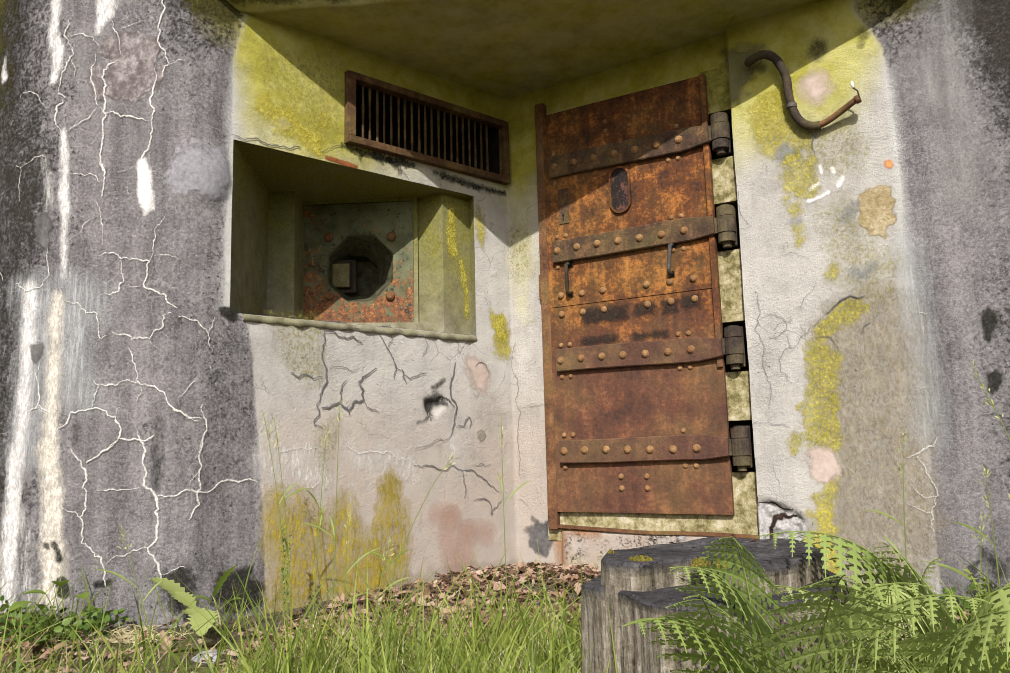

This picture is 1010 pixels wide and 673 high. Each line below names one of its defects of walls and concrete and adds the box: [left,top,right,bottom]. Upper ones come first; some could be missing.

efflorescence [49,0,64,83]
efflorescence [96,0,116,33]
efflorescence [137,159,152,212]
leakage [0,130,98,613]
crack [0,0,257,587]
crack [284,316,439,429]
crack [414,339,528,515]
crack [511,342,539,475]
crack [750,281,865,426]
leakage [979,306,997,342]
leakage [987,369,1002,393]
crack [755,464,797,539]